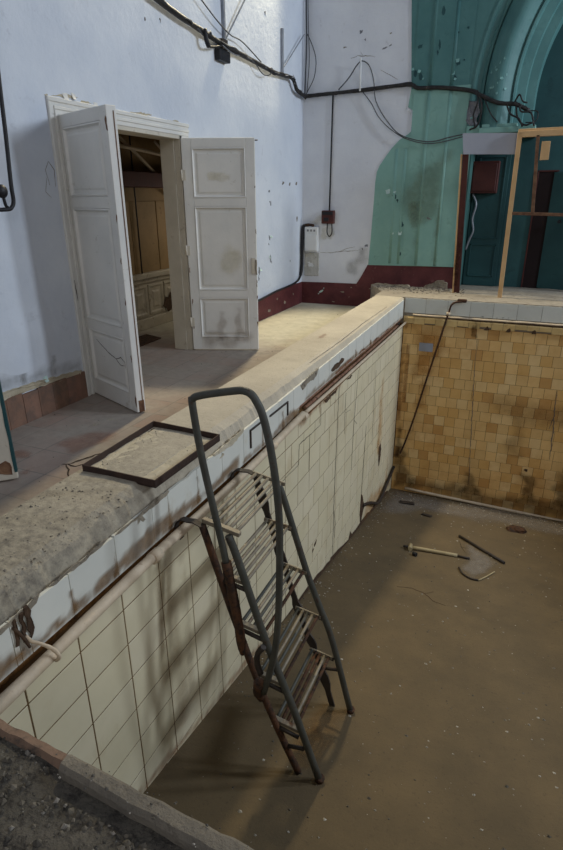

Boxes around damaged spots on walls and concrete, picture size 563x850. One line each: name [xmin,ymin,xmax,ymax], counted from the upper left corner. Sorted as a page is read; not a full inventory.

spalling [300,368,319,390]
crack [549,395,557,460]